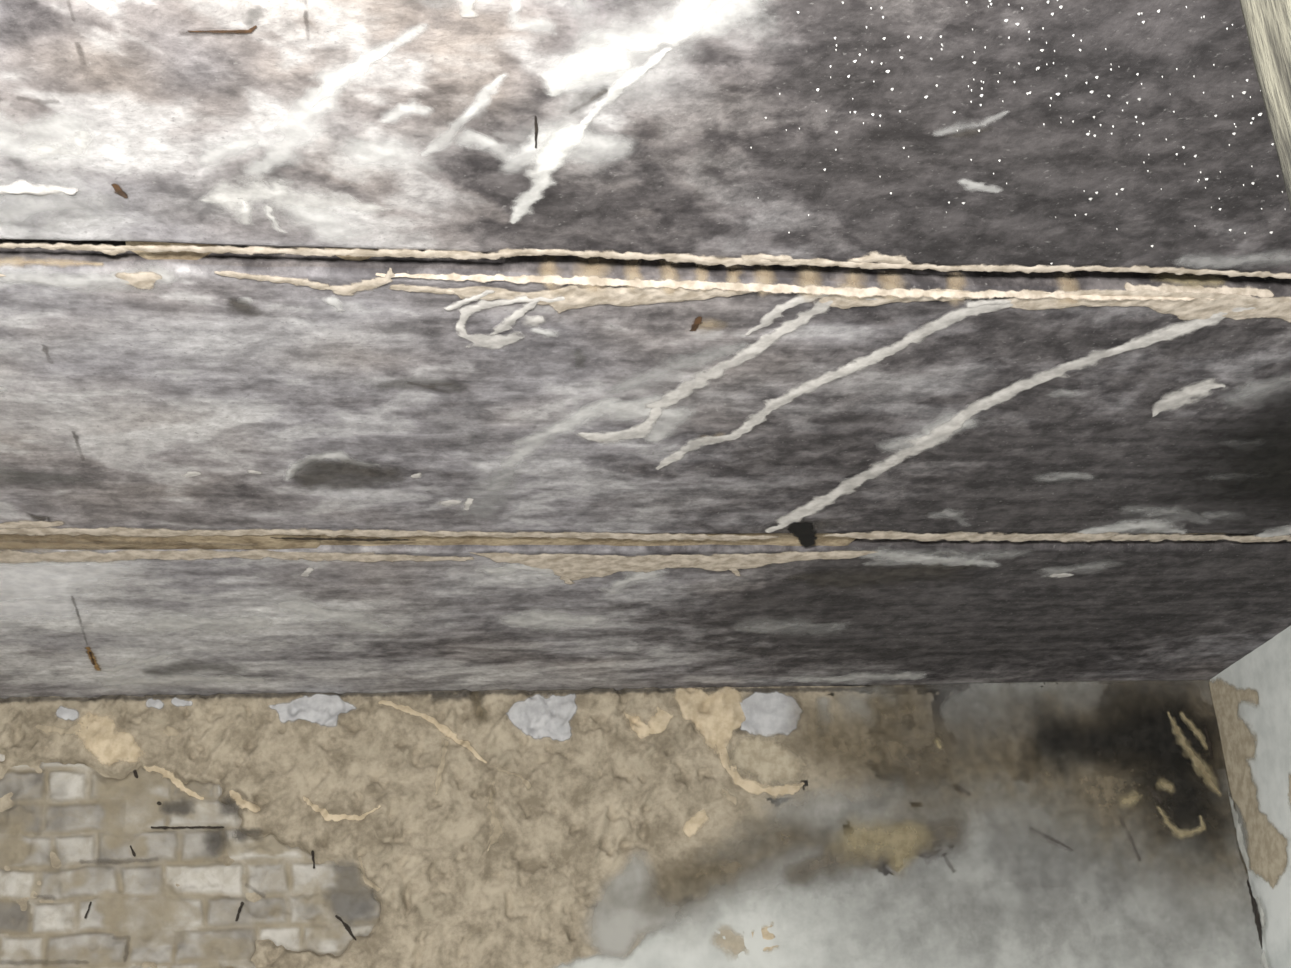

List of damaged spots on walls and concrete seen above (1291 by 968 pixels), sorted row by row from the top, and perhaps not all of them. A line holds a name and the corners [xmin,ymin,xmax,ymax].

leakage [202,26,428,231]
leakage [422,0,754,223]
leakage [0,243,1291,617]
peeling [146,697,192,709]
flaking render [0,706,381,968]
peeling [270,694,356,726]
leakage [0,664,680,721]
peeling [378,700,531,851]
peeling [506,694,577,741]
leakage [505,612,600,626]
peeling [558,679,1287,968]
leakage [658,673,1240,930]